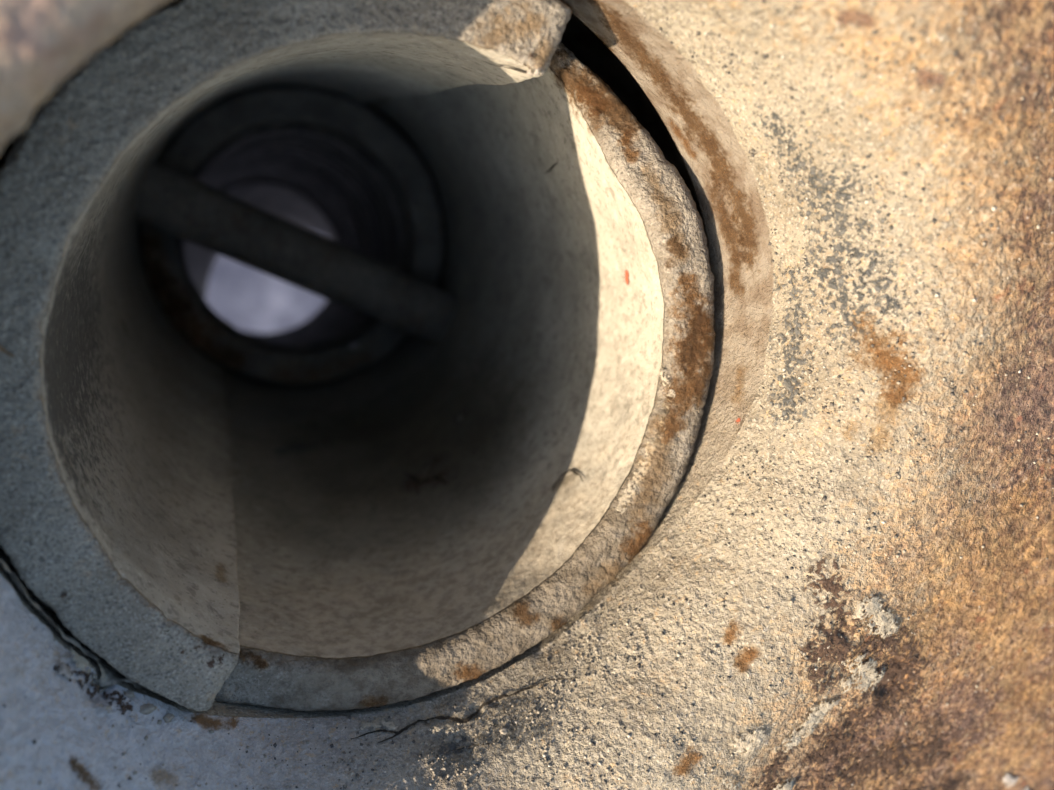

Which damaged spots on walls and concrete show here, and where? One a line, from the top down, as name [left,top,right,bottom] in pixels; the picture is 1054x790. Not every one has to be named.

corrosion [556,50,638,134]
corrosion [589,1,756,291]
crack [351,677,578,767]